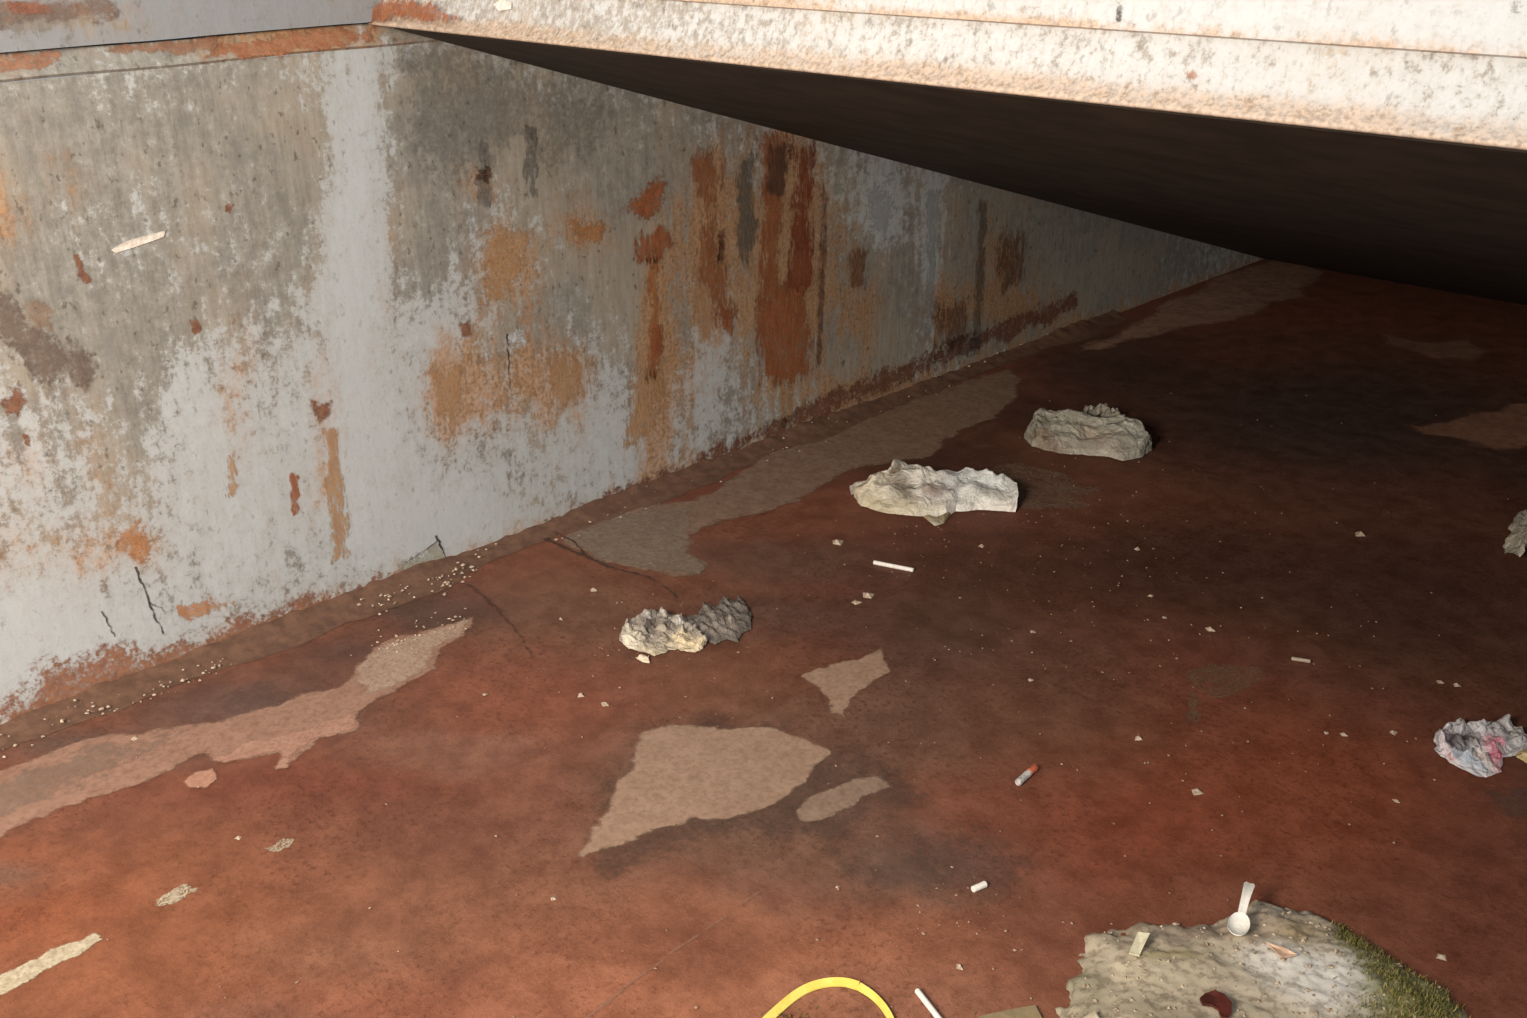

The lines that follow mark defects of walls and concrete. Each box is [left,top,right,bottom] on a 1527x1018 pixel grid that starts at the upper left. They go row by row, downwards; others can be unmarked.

rust [0,49,61,72]
rust [0,0,118,28]
rust [108,0,457,59]
rust [604,131,1078,498]
rust [225,455,237,497]
rust [289,473,300,516]
rust [321,428,350,562]
crack [134,567,164,634]
crack [410,535,532,654]
crack [543,532,678,598]
rust [0,571,389,722]